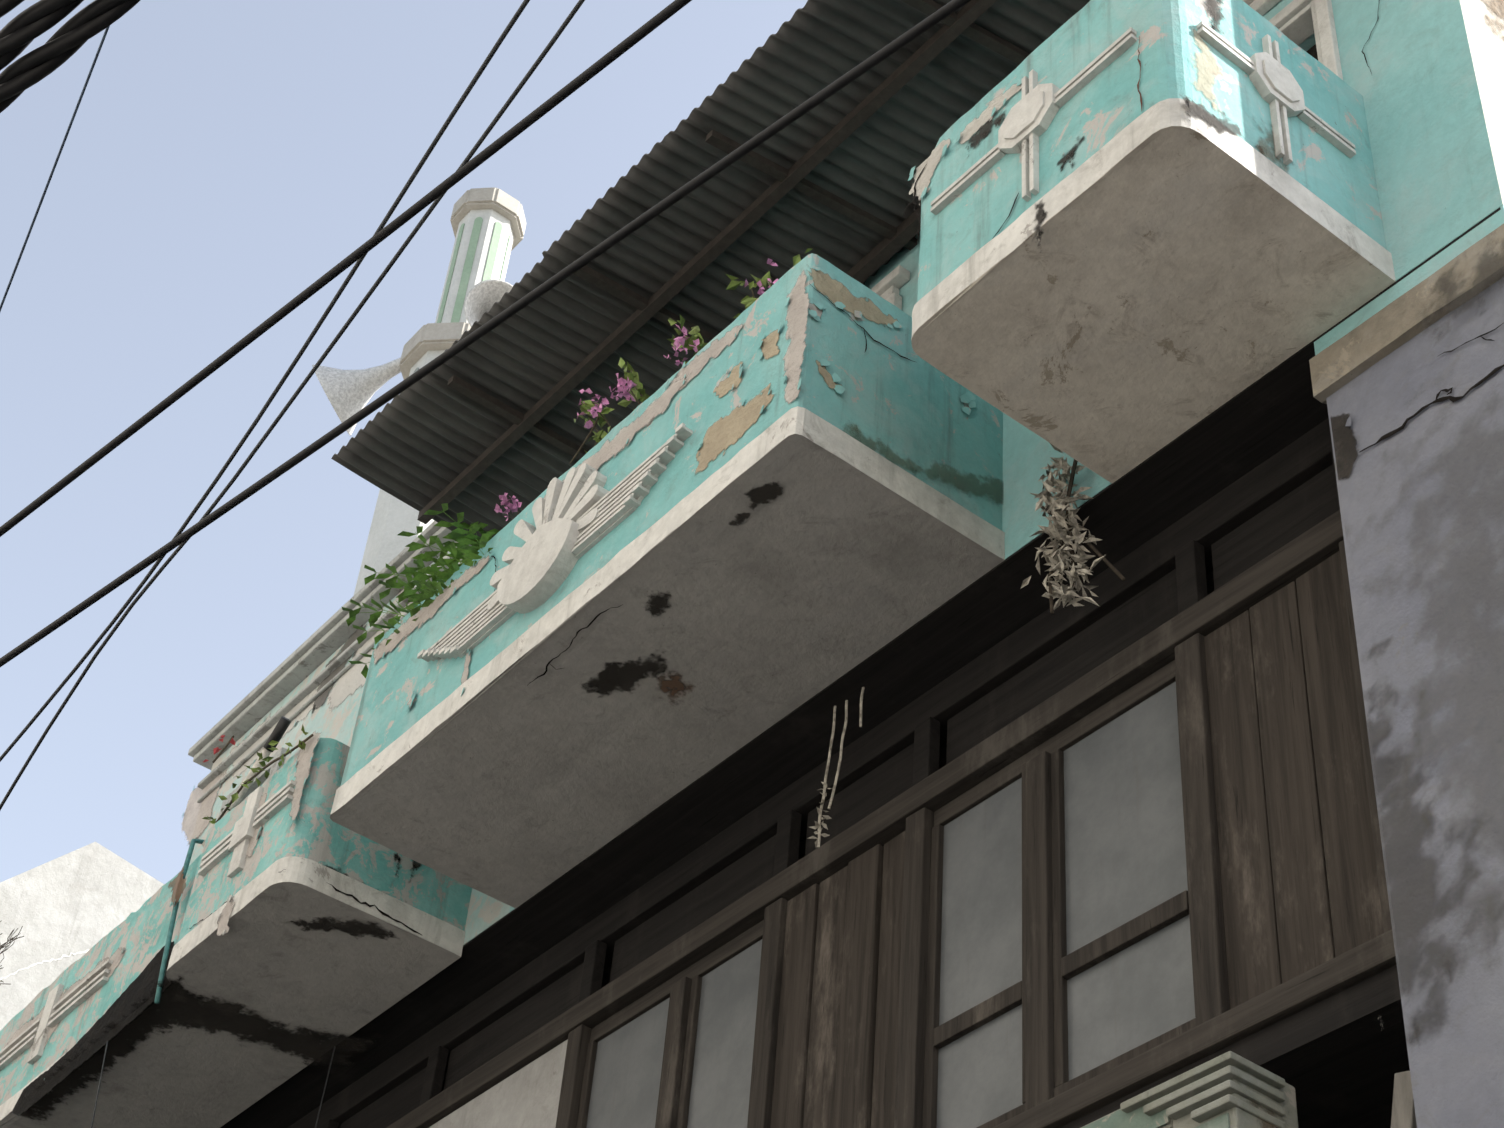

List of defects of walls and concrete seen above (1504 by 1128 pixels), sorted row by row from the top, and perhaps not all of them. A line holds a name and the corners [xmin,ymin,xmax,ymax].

peeling [908,75,1023,205]
peeling [563,267,903,482]
crack [1359,323,1504,453]
leakage [646,594,671,616]
leakage [582,654,692,702]
peeling [168,866,186,907]
peeling [215,894,235,936]
leakage [291,917,394,939]
flaking render [5,941,174,1116]
leakage [20,976,378,1120]